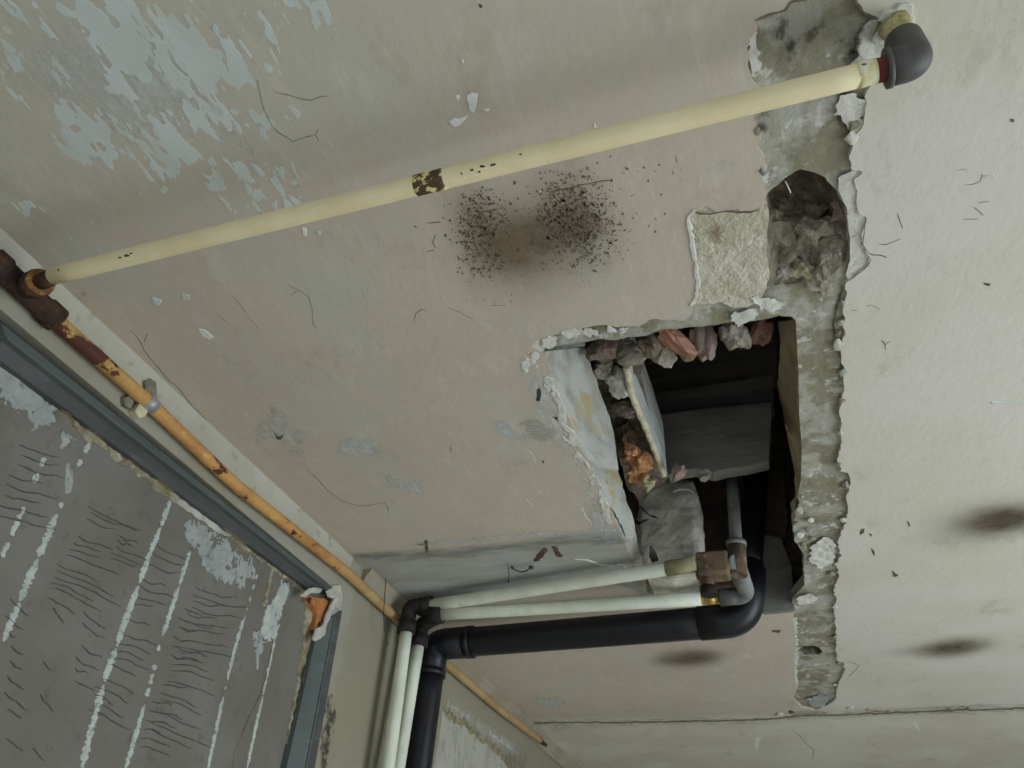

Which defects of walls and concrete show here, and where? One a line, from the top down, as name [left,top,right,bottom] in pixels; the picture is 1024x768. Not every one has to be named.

peeling [0,0,311,220]
peeling [244,0,335,75]
crack [257,81,325,141]
flaking render [746,0,884,88]
water stain [431,162,660,306]
flaking render [521,87,869,708]